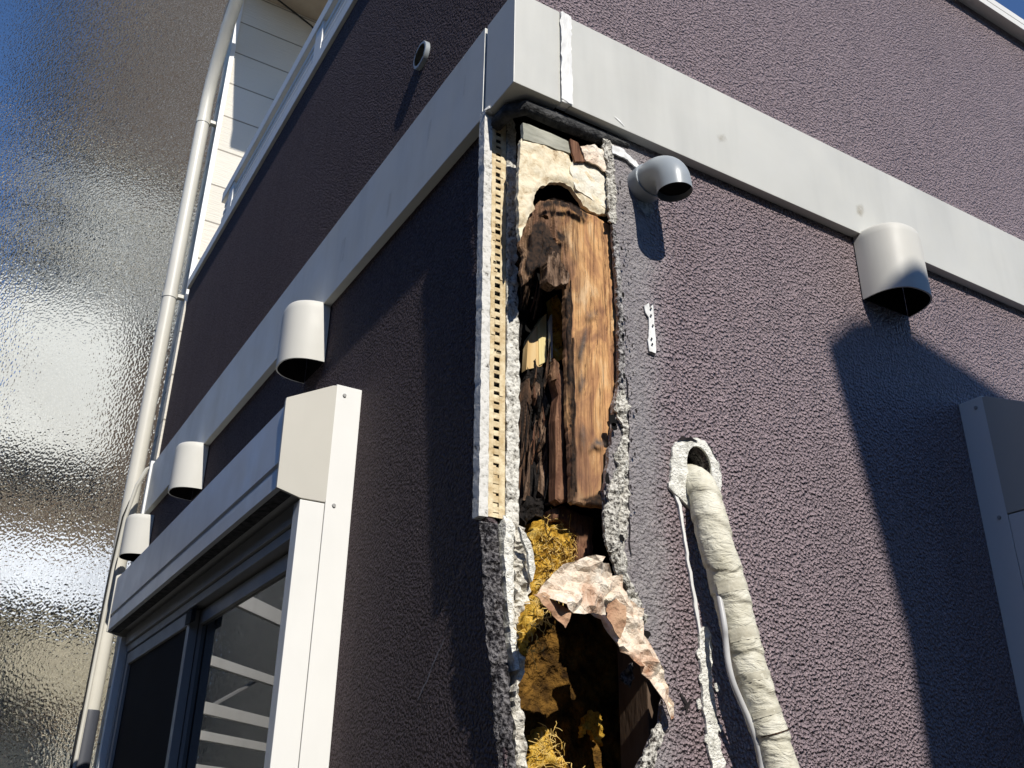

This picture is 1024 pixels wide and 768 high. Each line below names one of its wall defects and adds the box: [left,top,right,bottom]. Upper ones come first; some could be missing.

spalling [601,138,651,638]
spalling [667,436,722,510]
spalling [479,515,536,768]
spalling [638,721,665,768]